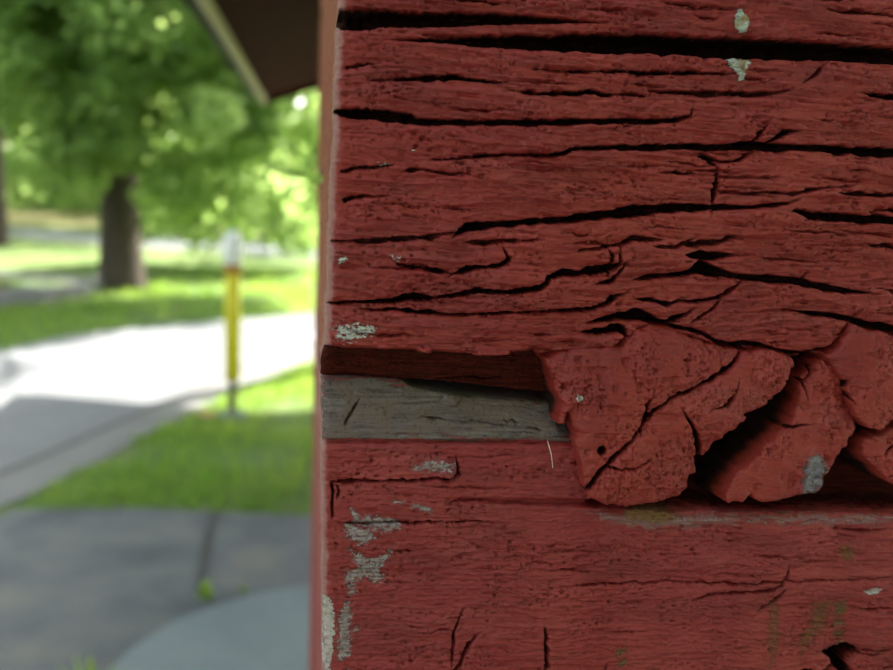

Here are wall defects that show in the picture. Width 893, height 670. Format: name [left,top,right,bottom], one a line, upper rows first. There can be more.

peeling [734,9,750,33]
peeling [726,58,751,81]
crack [327,1,893,354]
peeling [332,320,386,345]
peeling [803,455,825,494]
peeling [321,507,402,670]
crack [542,631,550,668]
crack [802,642,872,670]